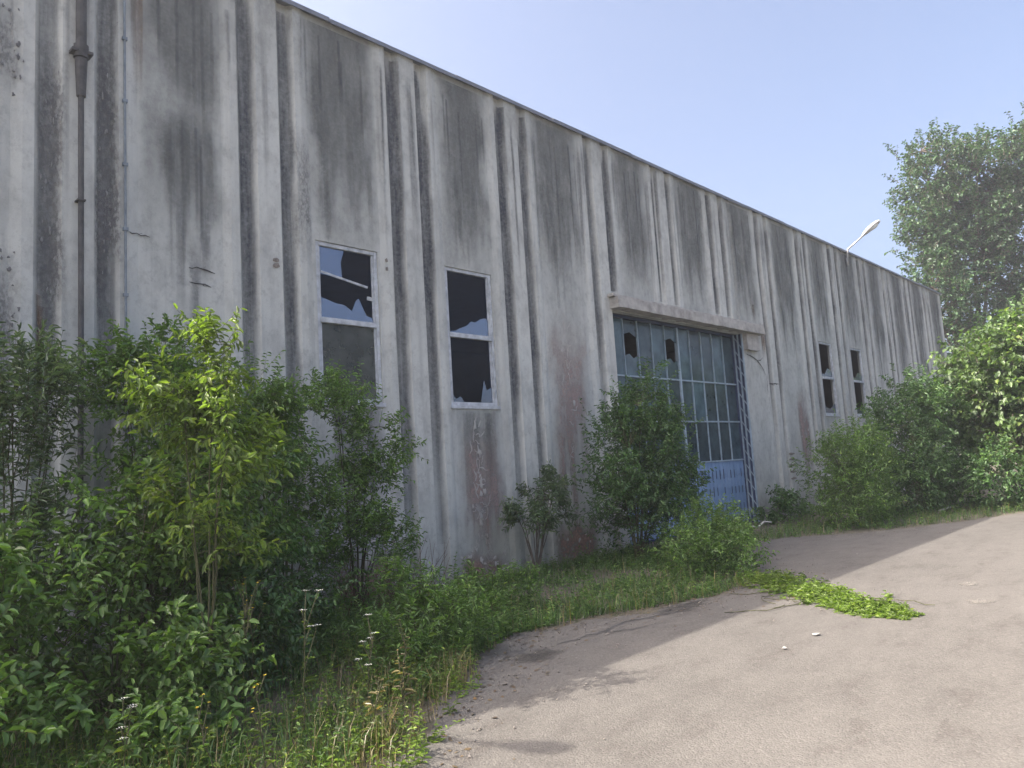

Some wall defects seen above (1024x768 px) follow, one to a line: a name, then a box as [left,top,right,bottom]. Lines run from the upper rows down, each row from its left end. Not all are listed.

crack [189,267,215,287]
leakage [494,107,518,433]
leakage [518,117,538,413]
leakage [601,153,615,292]
leakage [632,179,944,392]